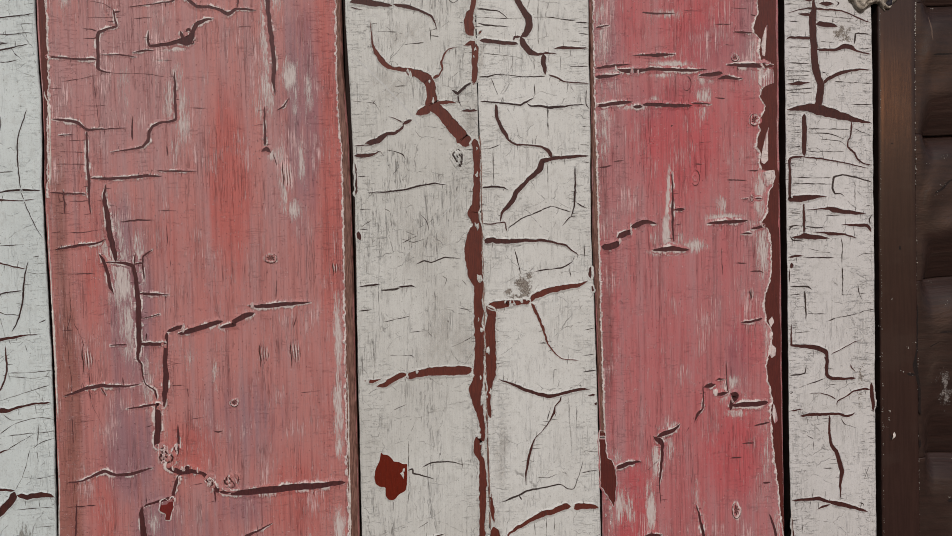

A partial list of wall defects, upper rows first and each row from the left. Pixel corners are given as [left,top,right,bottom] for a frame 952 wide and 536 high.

crack [0,0,346,536]
peeling [372,451,409,502]
crack [346,0,877,536]
peeling [750,0,784,536]